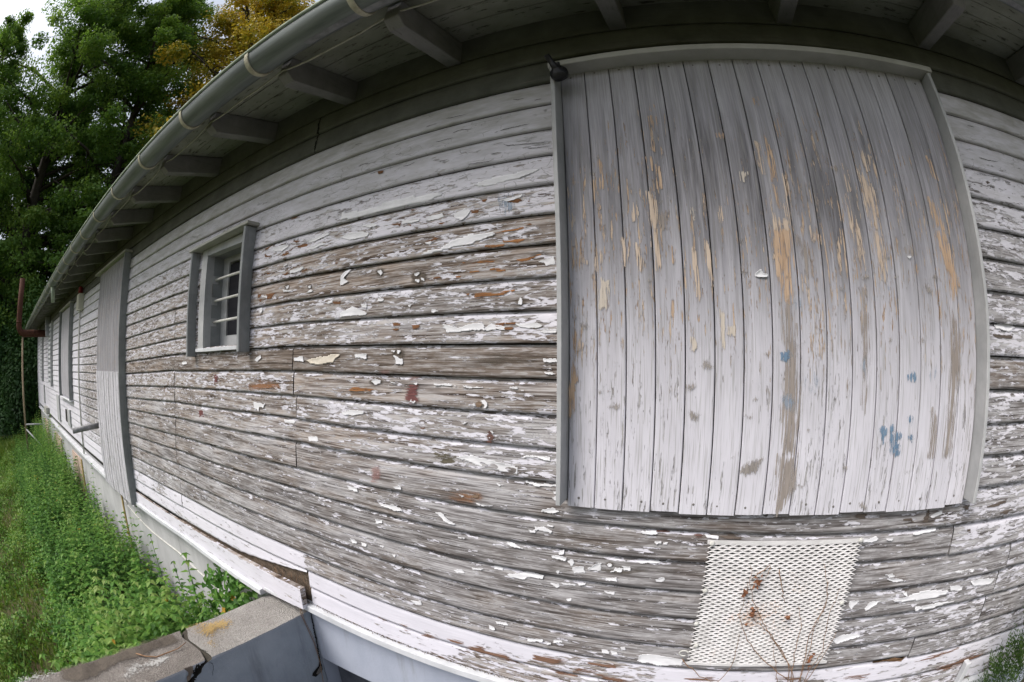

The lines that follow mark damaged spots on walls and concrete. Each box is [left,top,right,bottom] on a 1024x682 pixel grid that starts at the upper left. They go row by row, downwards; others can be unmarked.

peeling [258,169,539,313]
peeling [326,298,384,317]
peeling [739,137,820,517]
peeling [927,196,962,459]
peeling [294,354,340,365]
peeling [431,450,562,534]
peeling [454,550,660,601]
peeling [885,569,994,611]
crack [190,650,214,682]
peeling [422,633,519,663]
peeling [527,638,631,682]
peeling [833,634,860,654]